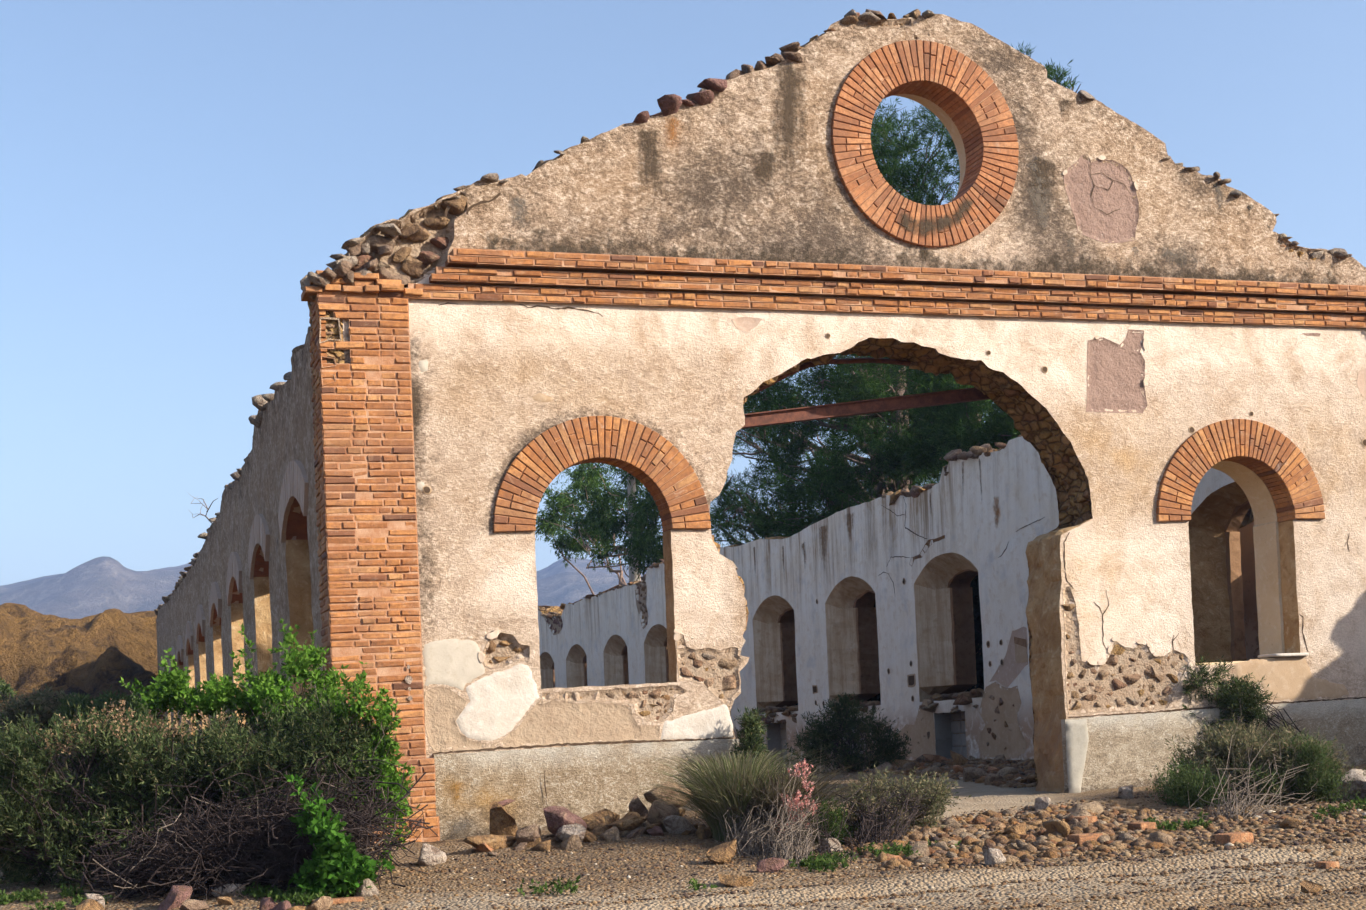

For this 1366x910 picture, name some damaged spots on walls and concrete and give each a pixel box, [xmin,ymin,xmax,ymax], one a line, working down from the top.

water stain [639,131,662,191]
water stain [756,64,805,182]
crack [1090,164,1131,215]
water stain [486,198,1338,284]
flaking render [1086,329,1148,413]
crack [878,497,945,593]
spalling [478,629,530,669]
flaking render [424,686,673,752]
flaking render [978,627,1028,758]